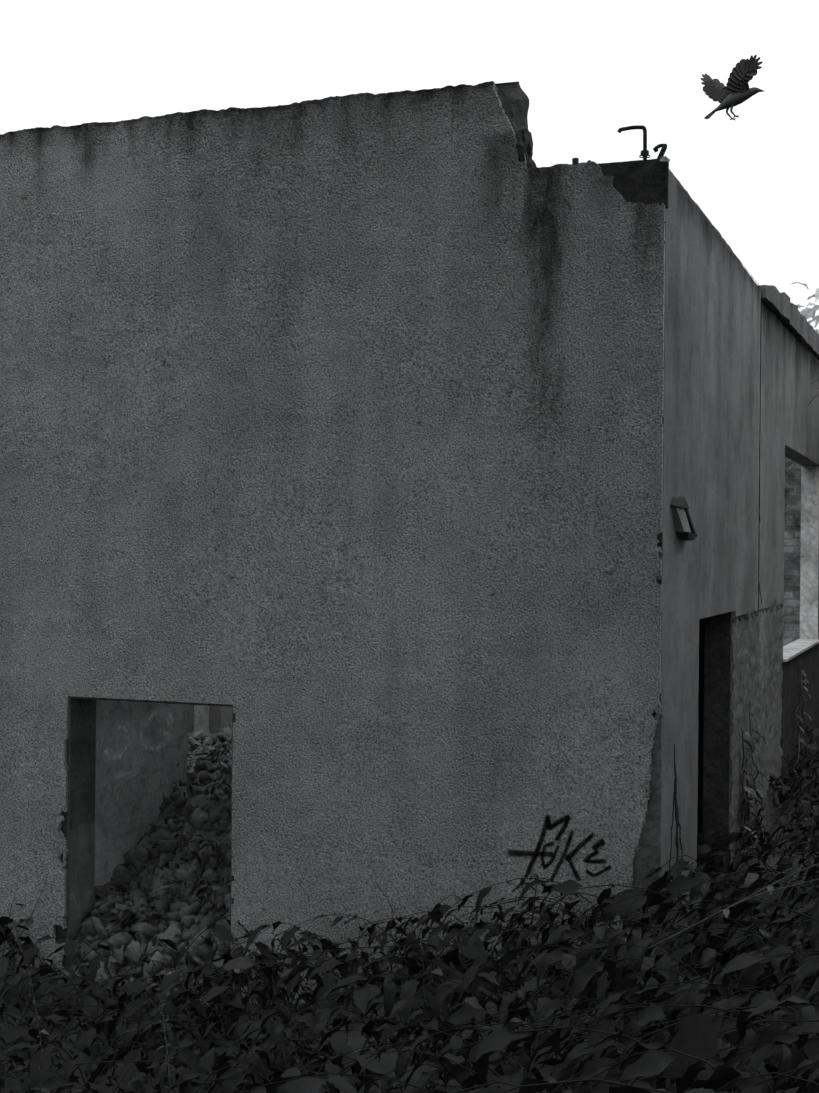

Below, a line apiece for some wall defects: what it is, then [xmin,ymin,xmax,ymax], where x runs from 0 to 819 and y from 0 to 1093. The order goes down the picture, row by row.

damp [0,104,291,138]
damp [387,81,493,98]
spalling [495,81,537,167]
spalling [598,125,670,209]
spalling [631,705,664,890]